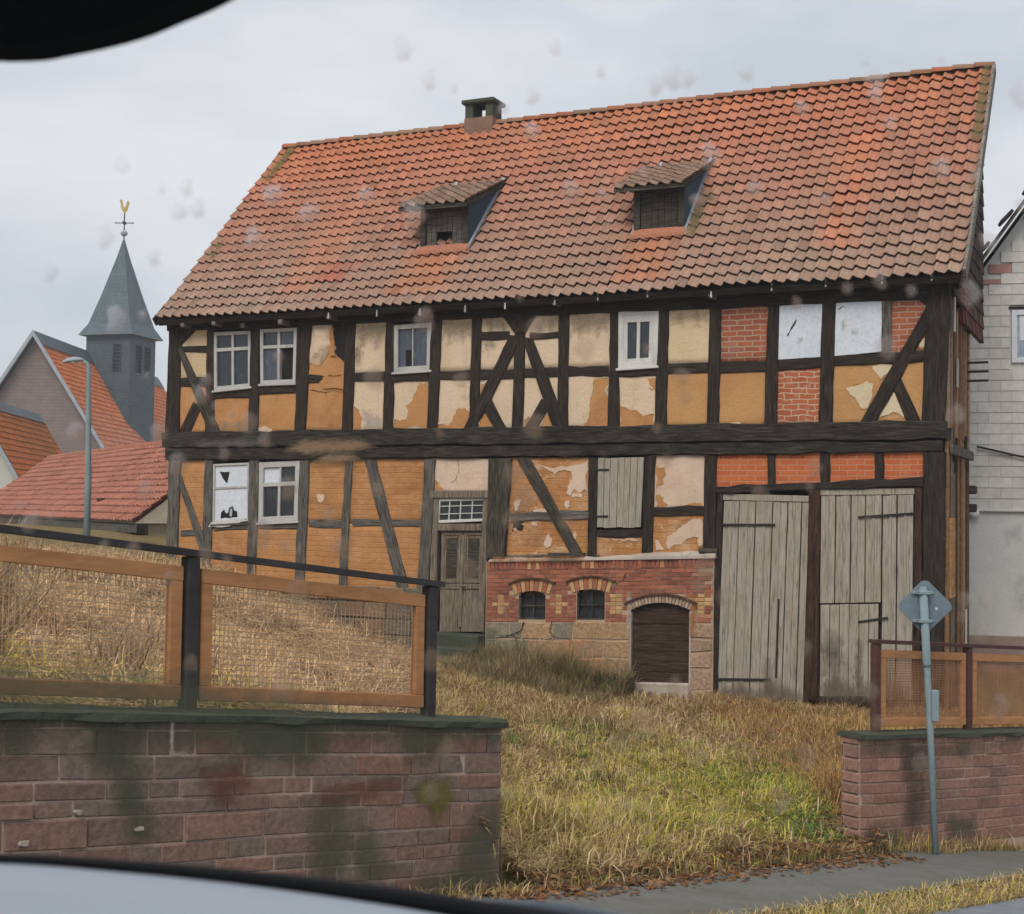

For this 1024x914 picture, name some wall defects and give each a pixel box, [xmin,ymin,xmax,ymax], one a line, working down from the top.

spalling [332,324,346,362]
spalling [353,405,364,429]
spalling [393,382,493,428]
spalling [584,377,655,426]
peeling [846,364,892,409]
peeling [878,392,905,419]
peeling [534,461,589,509]
spalling [656,466,667,507]
spalling [512,499,553,548]
peeling [654,503,703,551]